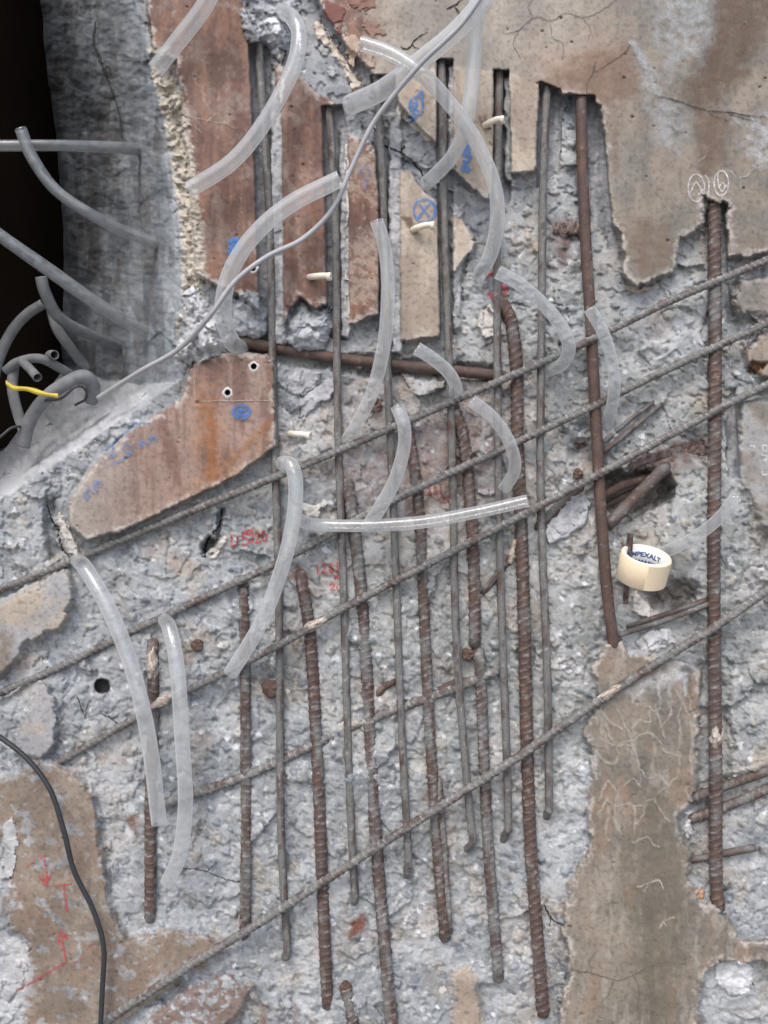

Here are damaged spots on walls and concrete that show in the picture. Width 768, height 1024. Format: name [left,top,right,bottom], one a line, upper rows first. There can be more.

spalling [139,0,225,349]
spalling [267,0,382,206]
peeling [362,23,387,39]
crack [507,0,631,93]
crack [658,95,768,126]
spalling [0,41,768,689]
spalling [0,305,768,1024]
rust [349,915,365,938]